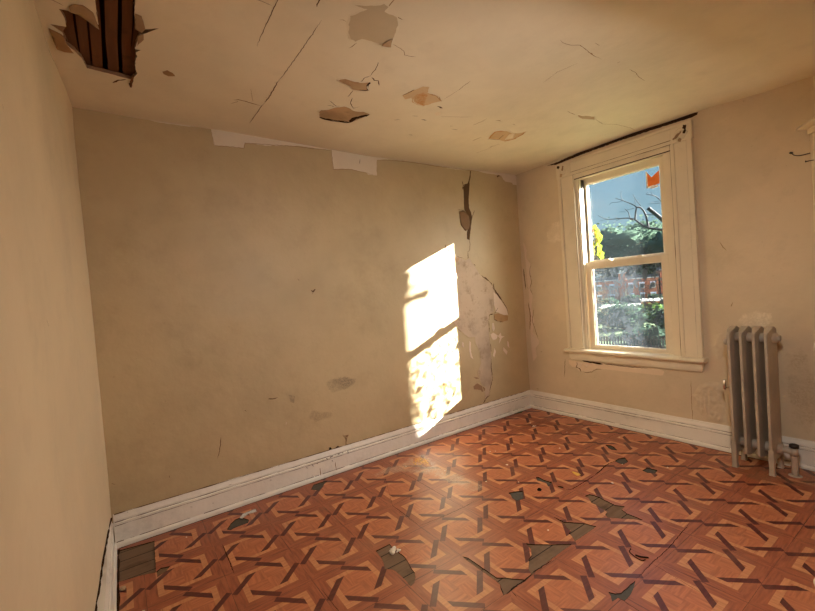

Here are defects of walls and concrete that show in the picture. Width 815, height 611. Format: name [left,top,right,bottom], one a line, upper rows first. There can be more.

spalling [50,0,159,79]
crack [231,0,321,121]
peeling [317,105,371,123]
peeling [336,77,371,91]
peeling [346,1,401,48]
crack [438,82,514,403]
flaking render [446,253,509,400]